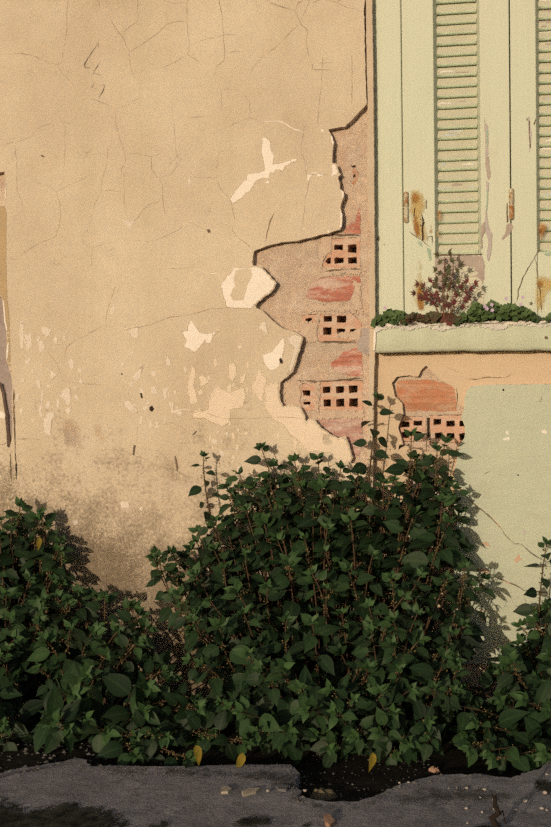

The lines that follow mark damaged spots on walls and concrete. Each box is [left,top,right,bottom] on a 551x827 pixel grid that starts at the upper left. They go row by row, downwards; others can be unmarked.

peeling [229,136,298,204]
peeling [307,163,339,180]
rust [412,192,431,239]
peeling [219,265,277,310]
rust [537,278,551,307]
flaking render [0,297,23,444]
peeling [18,321,83,437]
peeling [121,318,367,499]
crack [455,483,549,564]
crack [482,570,549,613]